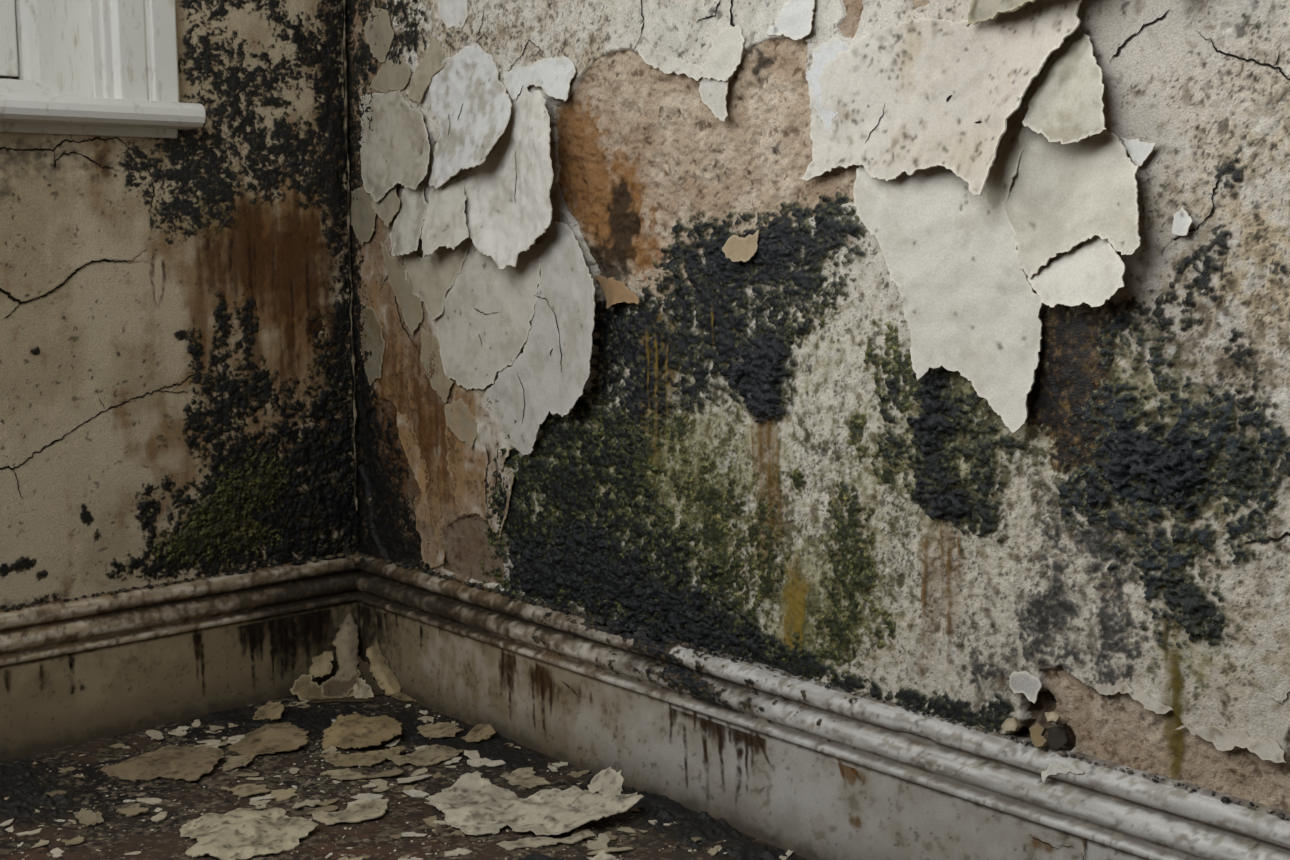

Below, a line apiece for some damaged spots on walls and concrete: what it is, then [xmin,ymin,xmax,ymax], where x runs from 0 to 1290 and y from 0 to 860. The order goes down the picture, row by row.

crack [696,0,735,27]
crack [1110,9,1290,80]
leakage [1214,156,1243,192]
crack [0,137,155,319]
leakage [106,0,452,583]
peeling [350,0,1157,583]
leakage [0,556,48,581]
leakage [0,593,61,610]
leakage [80,503,100,541]
leakage [479,192,1290,791]
crack [1242,532,1290,544]
flaking render [1001,668,1290,811]